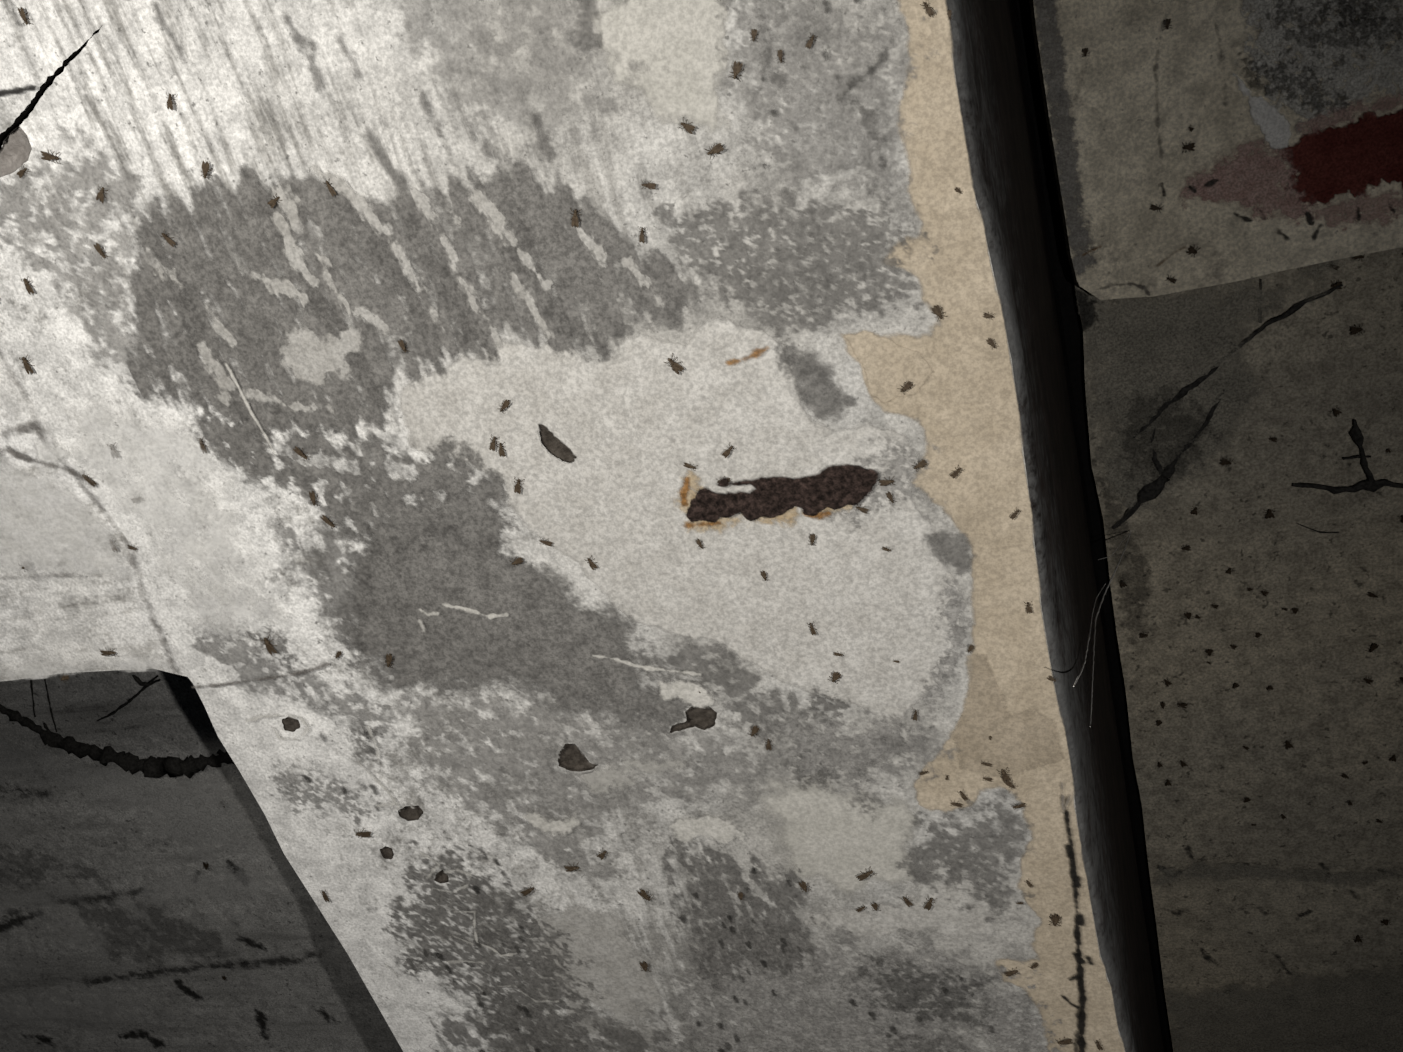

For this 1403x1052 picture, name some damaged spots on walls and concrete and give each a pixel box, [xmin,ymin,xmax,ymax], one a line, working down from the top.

crack [0,26,102,177]
peeling [197,306,333,413]
peeling [251,186,388,385]
peeling [312,166,426,292]
leakage [0,0,951,879]
peeling [398,0,1125,1052]
corrosion [678,465,878,532]
leakage [922,532,972,704]
spalling [380,846,394,859]
leakage [382,816,1061,1052]
leakage [898,791,1031,922]
crack [1061,783,1094,1052]